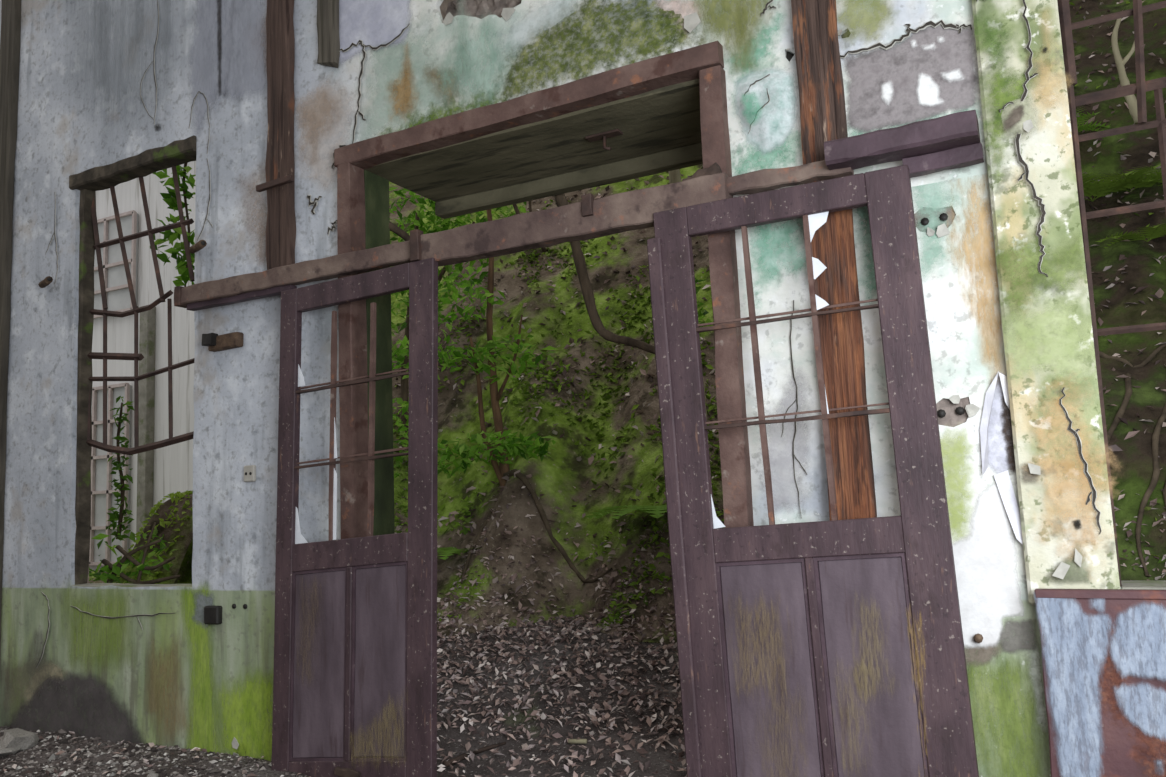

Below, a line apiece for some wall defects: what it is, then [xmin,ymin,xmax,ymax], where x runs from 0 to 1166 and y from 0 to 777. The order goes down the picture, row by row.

crack [331,24,410,168]
flaking render [443,0,522,25]
crack [840,0,978,58]
peeling [846,25,978,133]
crack [999,0,1048,277]
crack [307,195,337,236]
rust [959,184,1000,354]
flaking render [936,371,1041,544]
crack [1059,387,1102,534]
damp [7,664,143,744]
rust [1098,631,1132,721]